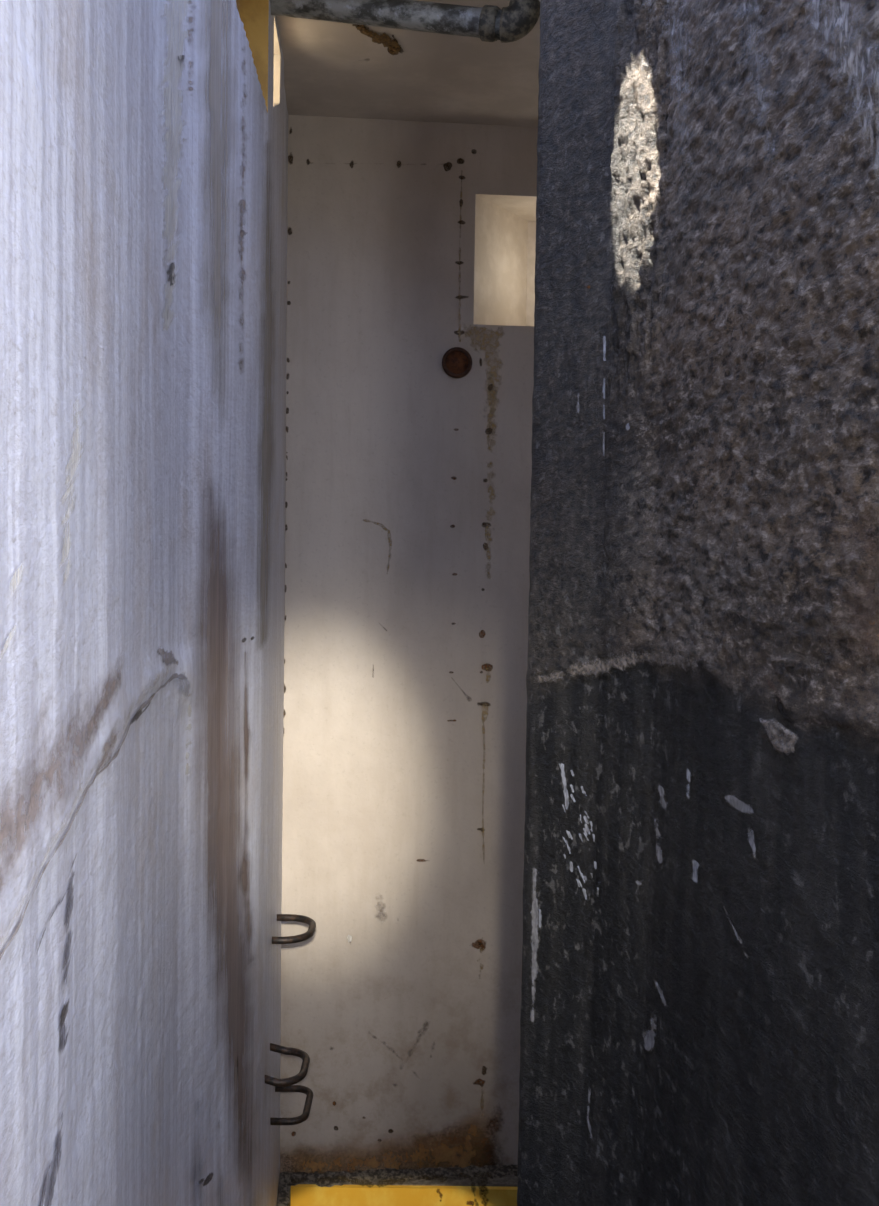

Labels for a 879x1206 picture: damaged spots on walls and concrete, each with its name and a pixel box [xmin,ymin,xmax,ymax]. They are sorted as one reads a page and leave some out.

corrosion [443,149,476,179]
water stain [201,505,252,1171]